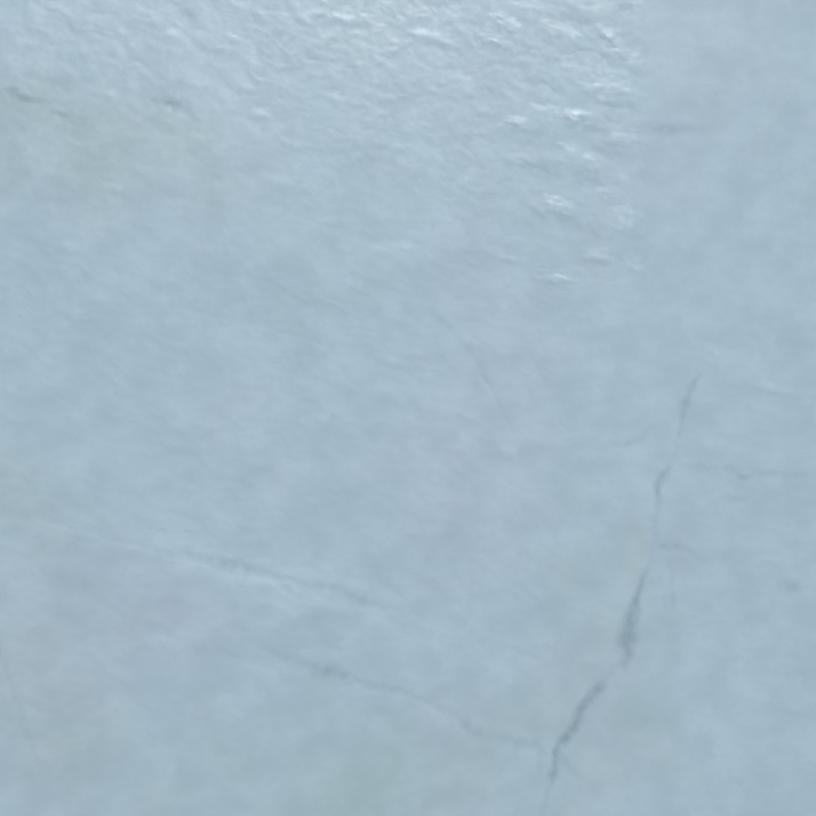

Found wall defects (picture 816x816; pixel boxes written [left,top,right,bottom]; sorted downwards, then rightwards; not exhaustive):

crack [535,367,714,816]